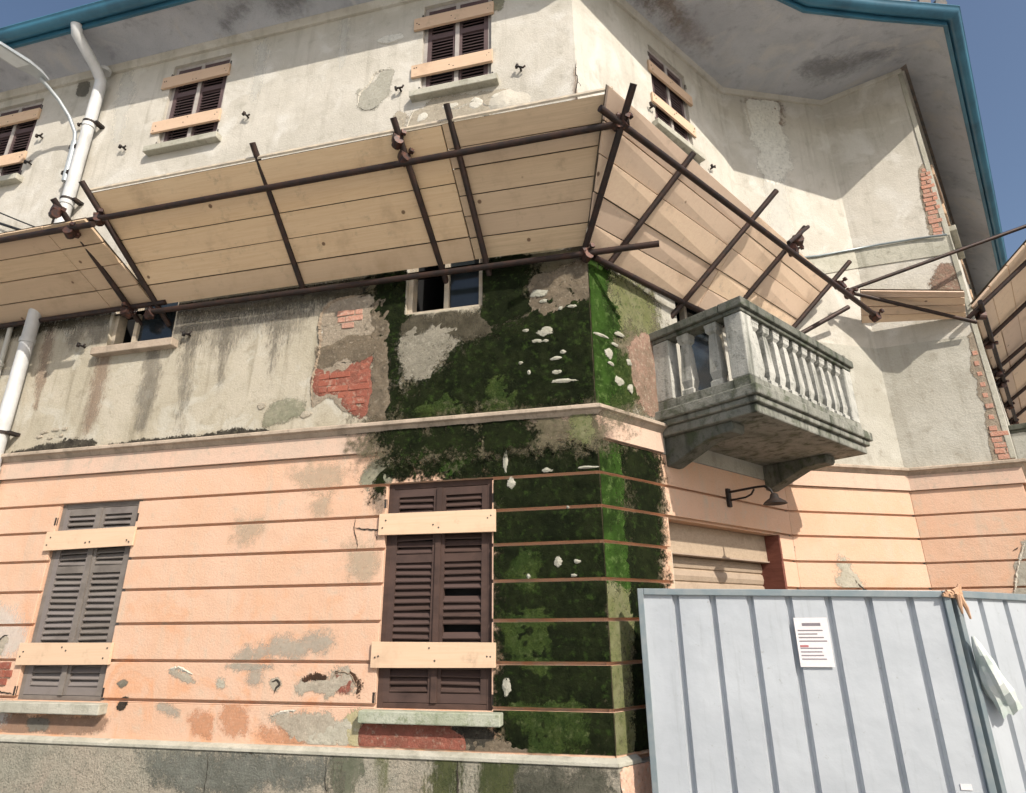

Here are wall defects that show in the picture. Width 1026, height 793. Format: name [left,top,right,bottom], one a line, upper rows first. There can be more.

crack [573,60,581,100]
peeling [743,98,797,241]
flaking render [918,163,943,236]
peeling [257,294,464,427]
leakage [522,326,553,343]
leakage [550,350,578,383]
leakage [594,331,633,394]
flaking render [967,332,1015,461]
leakage [503,453,516,489]
flaking render [157,630,539,753]
leakage [502,678,511,697]
leakage [135,749,365,793]